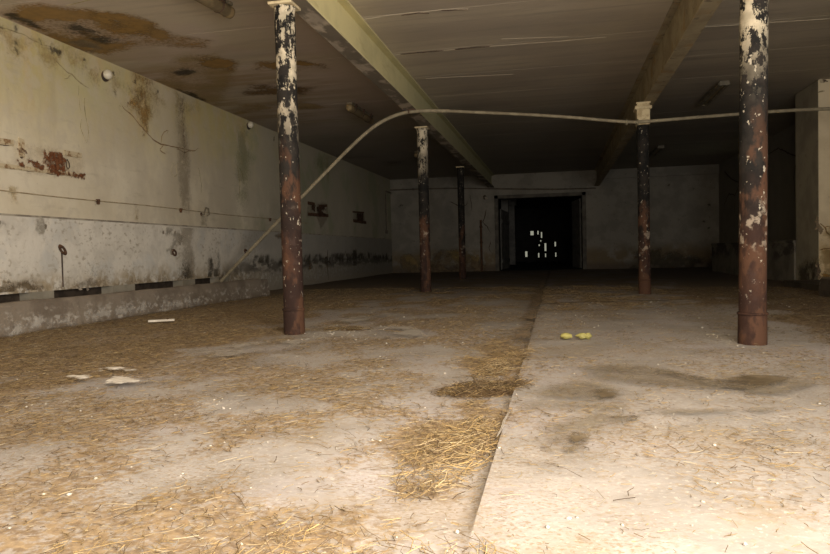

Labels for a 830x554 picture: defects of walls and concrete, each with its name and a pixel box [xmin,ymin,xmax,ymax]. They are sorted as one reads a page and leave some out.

water stain [5,4,209,60]
rust [0,138,86,179]